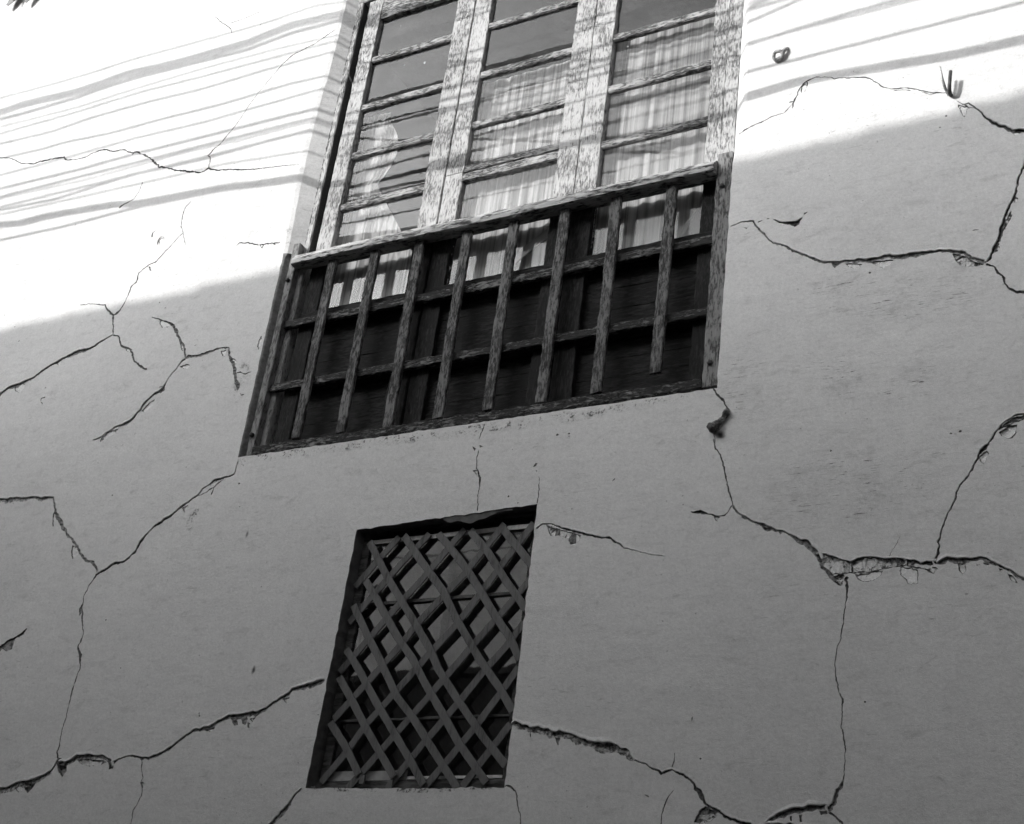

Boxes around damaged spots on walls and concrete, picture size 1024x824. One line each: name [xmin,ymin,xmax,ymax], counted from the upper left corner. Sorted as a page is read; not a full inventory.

crack [0,204,249,442]
crack [238,241,280,249]
crack [730,76,1024,294]
crack [0,459,325,824]
crack [511,412,1024,824]